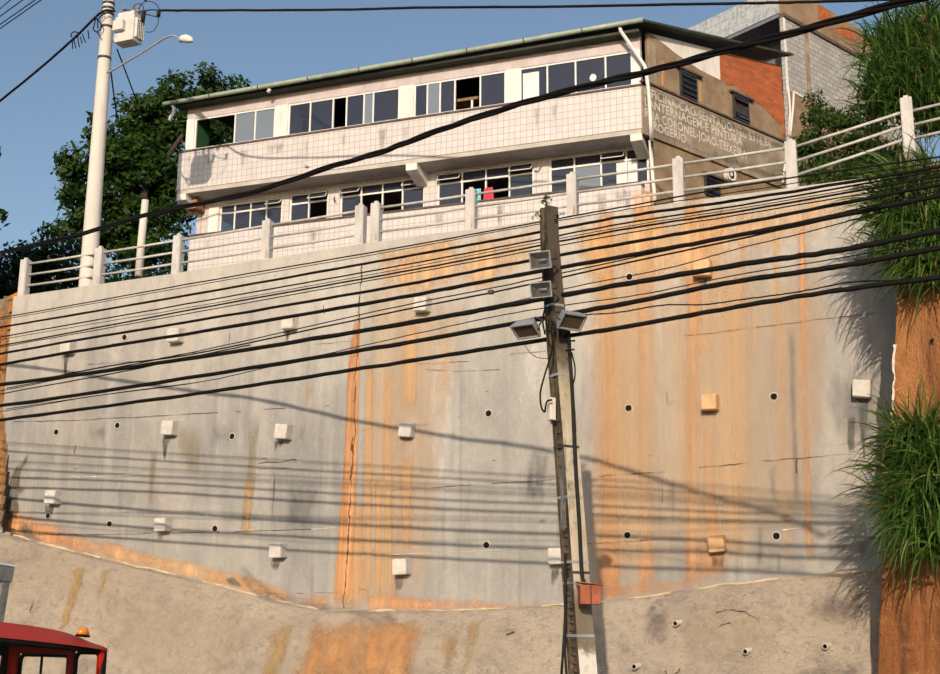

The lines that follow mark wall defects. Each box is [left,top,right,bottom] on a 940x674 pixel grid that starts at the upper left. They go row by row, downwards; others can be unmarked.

crack [236,266,465,608]
corrosion [335,325,451,610]
corrosion [584,195,830,596]
crack [34,530,111,538]
corrosion [63,569,82,625]
corrosion [8,513,287,599]
corrosion [301,624,417,674]